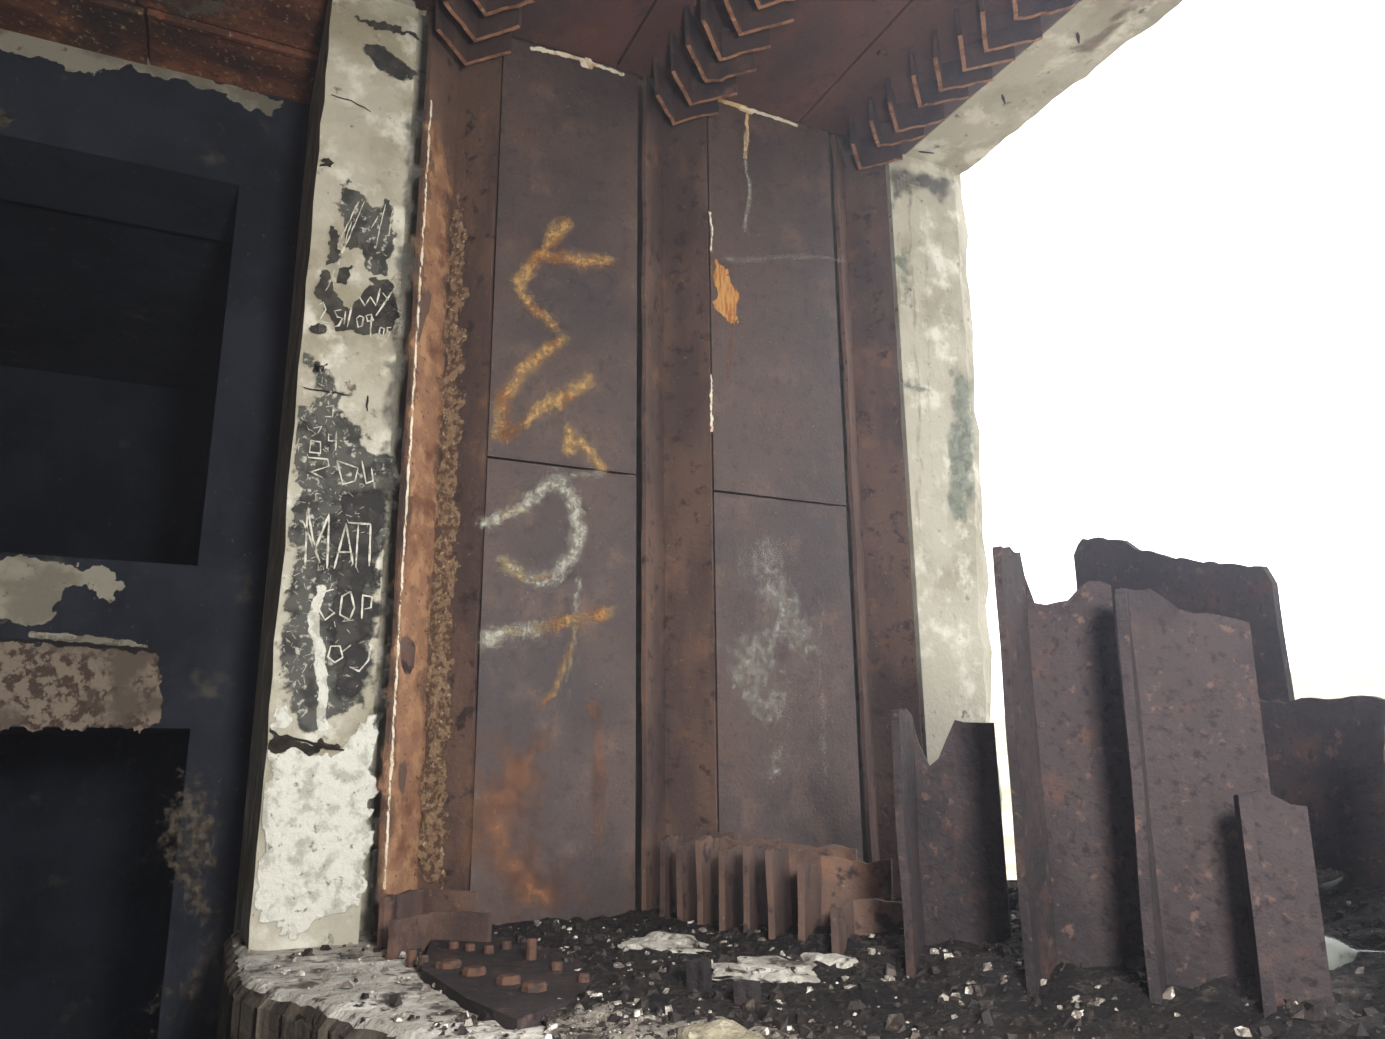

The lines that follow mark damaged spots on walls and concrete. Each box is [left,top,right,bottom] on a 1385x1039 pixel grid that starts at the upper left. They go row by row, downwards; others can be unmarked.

peeling [0,29,284,116]
peeling [0,554,163,733]
peeling [255,585,378,941]
rust [378,123,470,895]